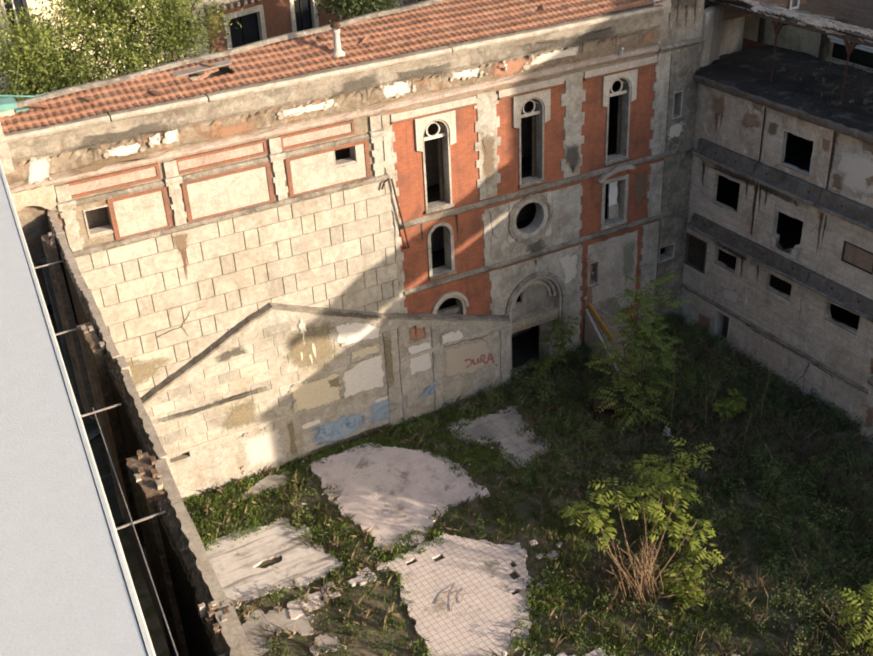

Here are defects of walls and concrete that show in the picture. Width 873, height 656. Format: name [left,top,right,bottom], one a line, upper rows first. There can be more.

peeling [450,45,582,81]
peeling [380,80,416,98]
peeling [277,99,338,120]
peeling [103,129,179,158]
leakage [299,318,316,363]
peeling [336,321,383,361]
peeling [289,372,353,413]